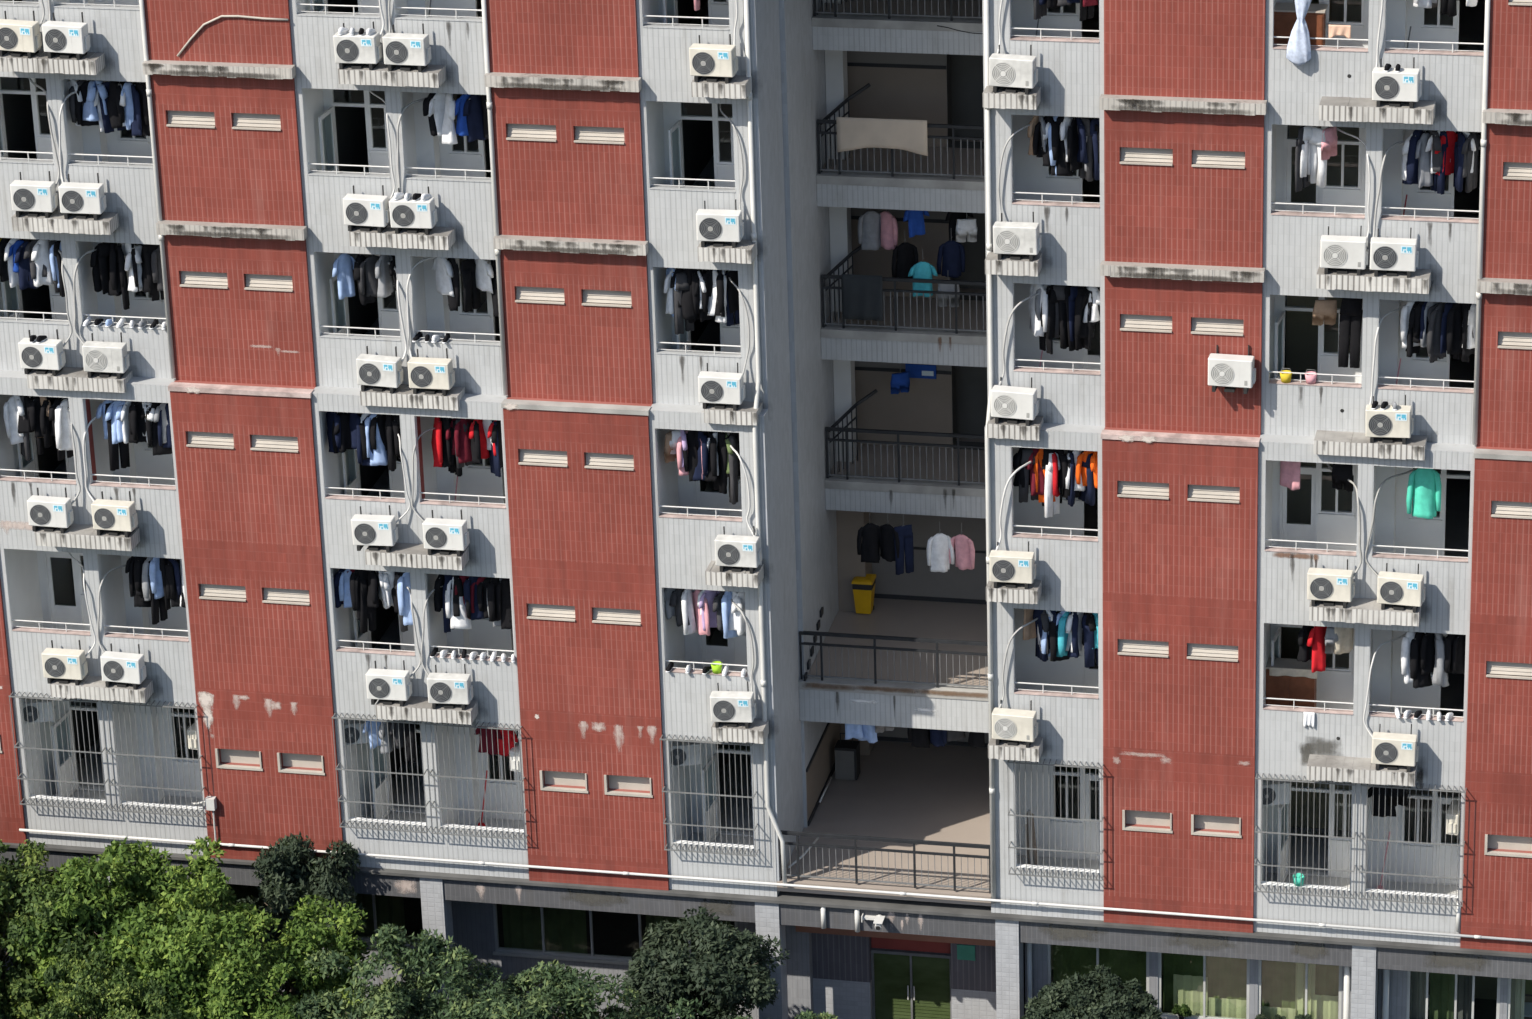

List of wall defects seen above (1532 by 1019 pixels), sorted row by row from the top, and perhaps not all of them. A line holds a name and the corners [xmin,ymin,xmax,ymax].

water stain [1120,99,1240,114]
water stain [1119,266,1252,281]
peeling [198,692,213,727]
peeling [581,722,621,743]